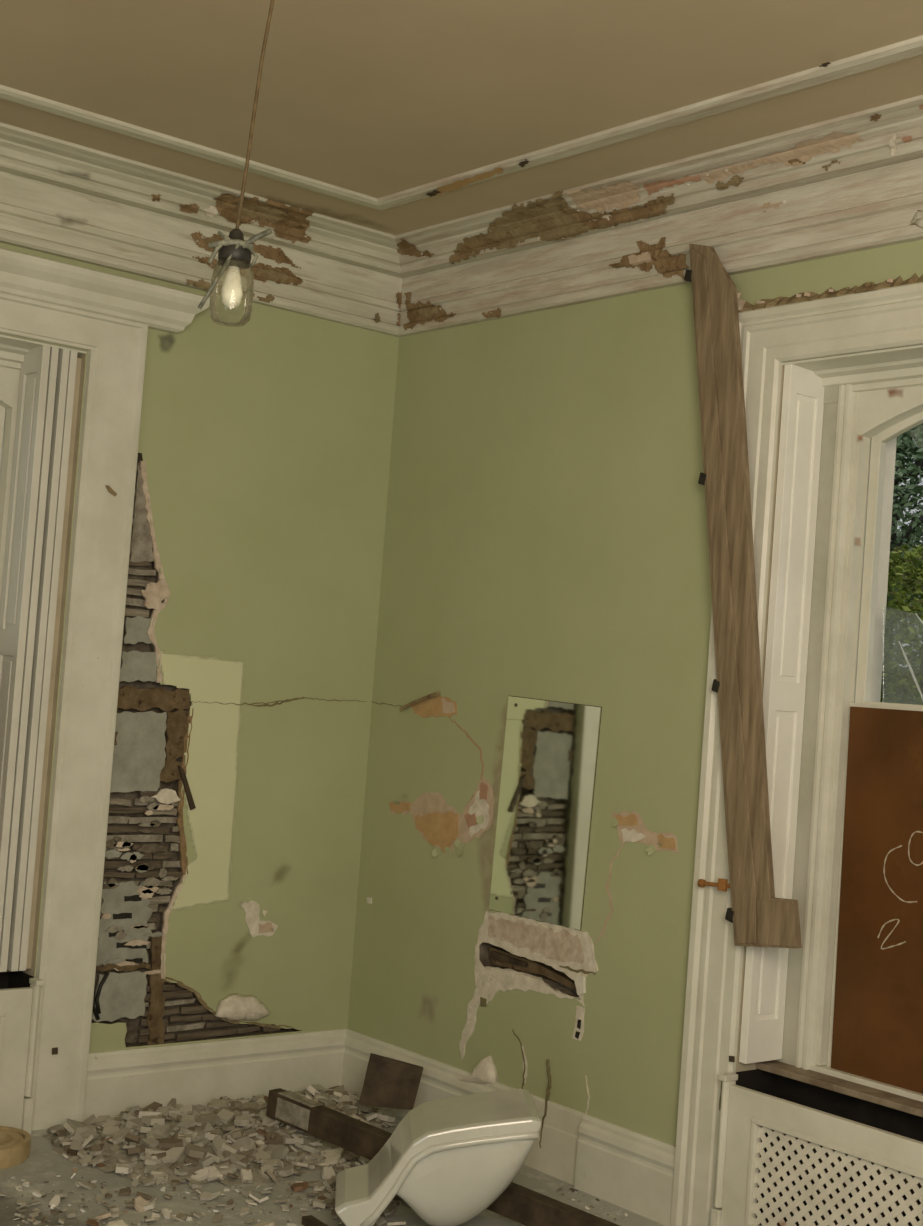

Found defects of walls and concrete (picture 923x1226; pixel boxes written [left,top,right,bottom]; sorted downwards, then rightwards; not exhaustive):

flaking render [427,167,504,197]
flaking render [449,131,864,264]
flaking render [179,192,316,303]
flaking render [397,239,434,258]
flaking render [609,237,689,279]
flaking render [395,292,456,330]
flaking render [482,308,501,318]
crack [193,697,402,707]
flaking render [92,461,293,1045]
peeling [389,691,494,857]
flaking render [488,811,679,995]